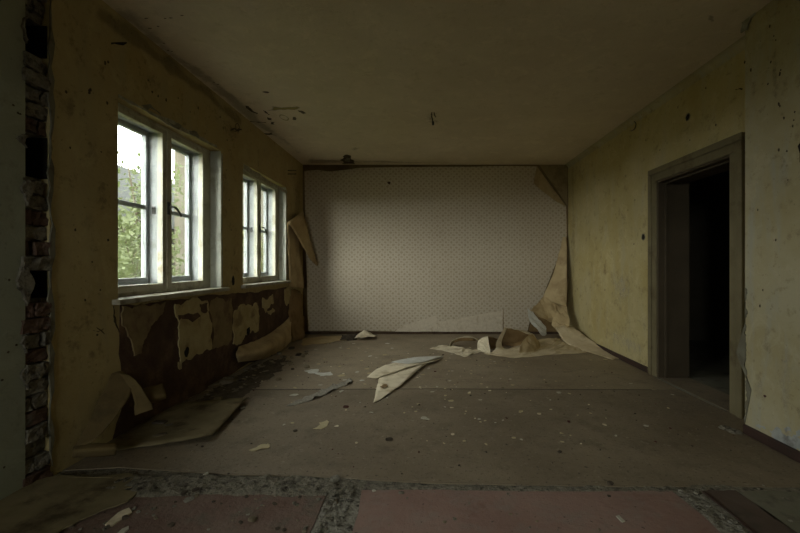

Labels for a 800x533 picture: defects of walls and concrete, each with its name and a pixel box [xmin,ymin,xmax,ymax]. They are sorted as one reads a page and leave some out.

spalling [7,0,56,487]
peeling [113,153,291,439]
flaking render [528,314,557,332]